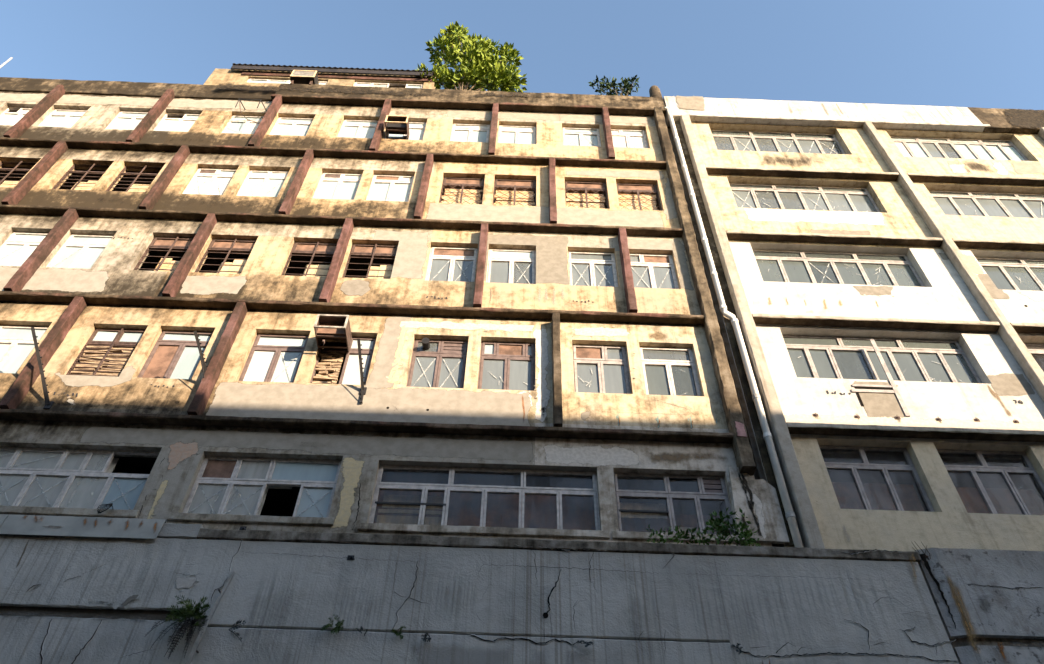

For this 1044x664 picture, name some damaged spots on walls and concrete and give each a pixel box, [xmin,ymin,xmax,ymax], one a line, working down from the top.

peeling [145,439,202,519]
peeling [331,457,367,531]
crack [40,619,53,664]
crack [71,620,102,664]
crack [273,553,428,631]
crack [471,544,1042,662]